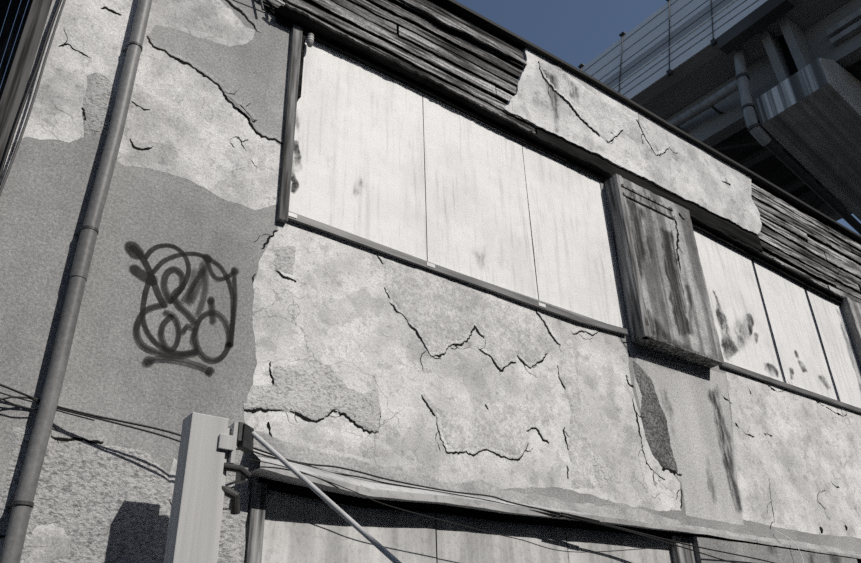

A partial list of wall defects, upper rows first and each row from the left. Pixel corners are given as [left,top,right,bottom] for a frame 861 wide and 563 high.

spalling [82,73,114,135]
crack [147,36,283,168]
crack [538,61,675,156]
crack [384,287,600,390]
leakage [713,291,758,357]
spalling [0,426,33,536]
spalling [20,437,177,563]
crack [243,403,381,437]
crack [422,393,569,479]
crack [621,338,683,507]
spalling [633,361,678,473]